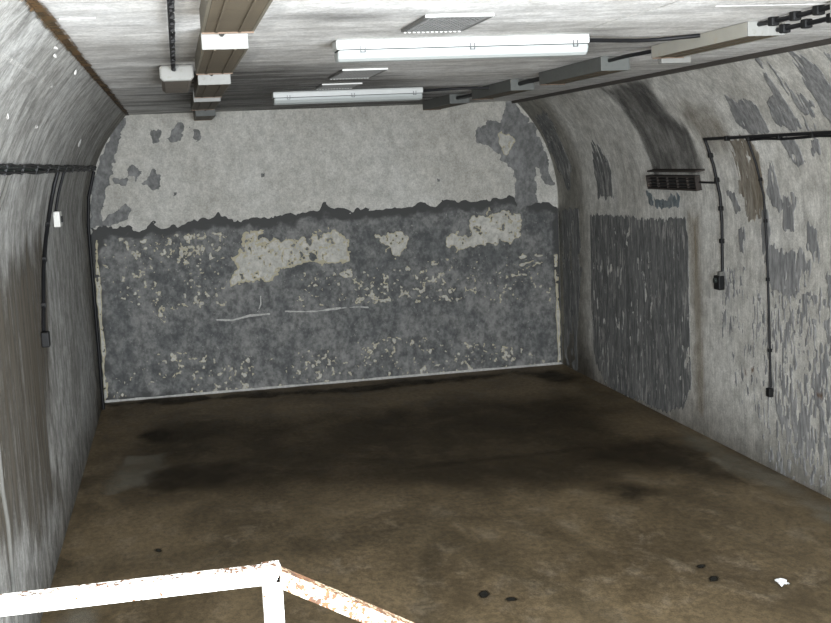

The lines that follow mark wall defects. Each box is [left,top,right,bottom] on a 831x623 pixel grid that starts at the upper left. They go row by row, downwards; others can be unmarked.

peeling [90,101,692,413]
peeling [722,51,831,489]